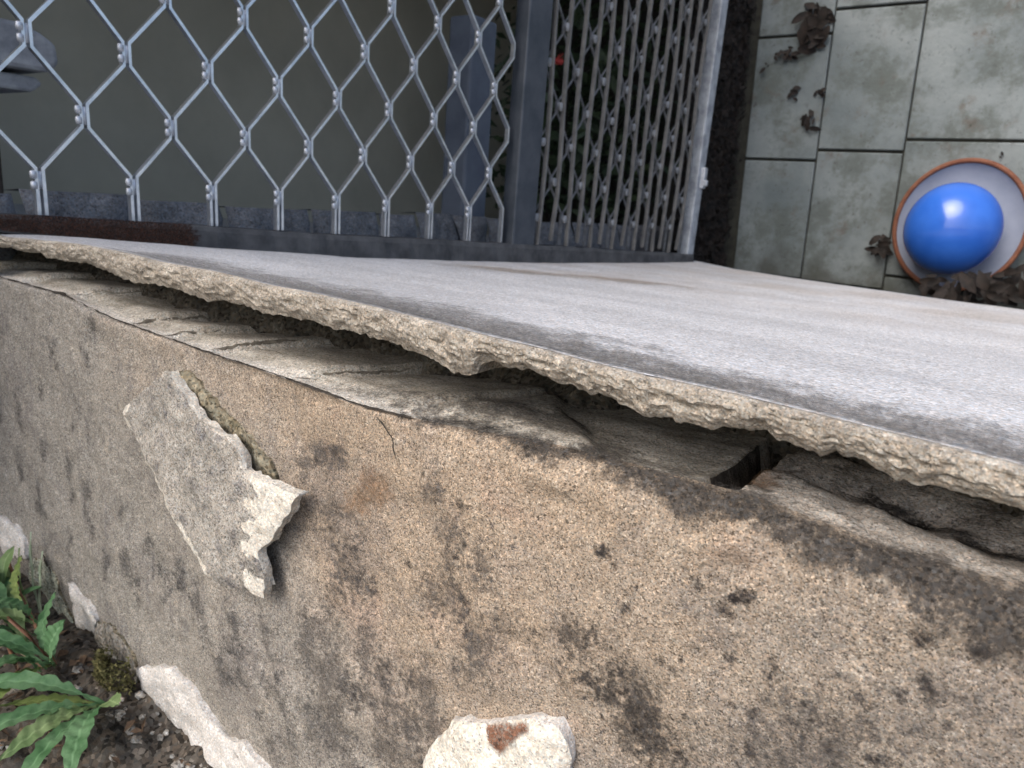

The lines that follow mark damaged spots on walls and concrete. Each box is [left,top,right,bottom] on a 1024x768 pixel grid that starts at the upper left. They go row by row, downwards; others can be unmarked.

rust [0,214,201,247]
crack [0,250,802,490]
crack [832,451,874,468]
water stain [340,384,1024,660]
crack [945,488,1024,517]
water stain [416,524,513,689]
water stain [558,612,691,768]
water stain [729,683,905,768]
water stain [916,673,944,702]